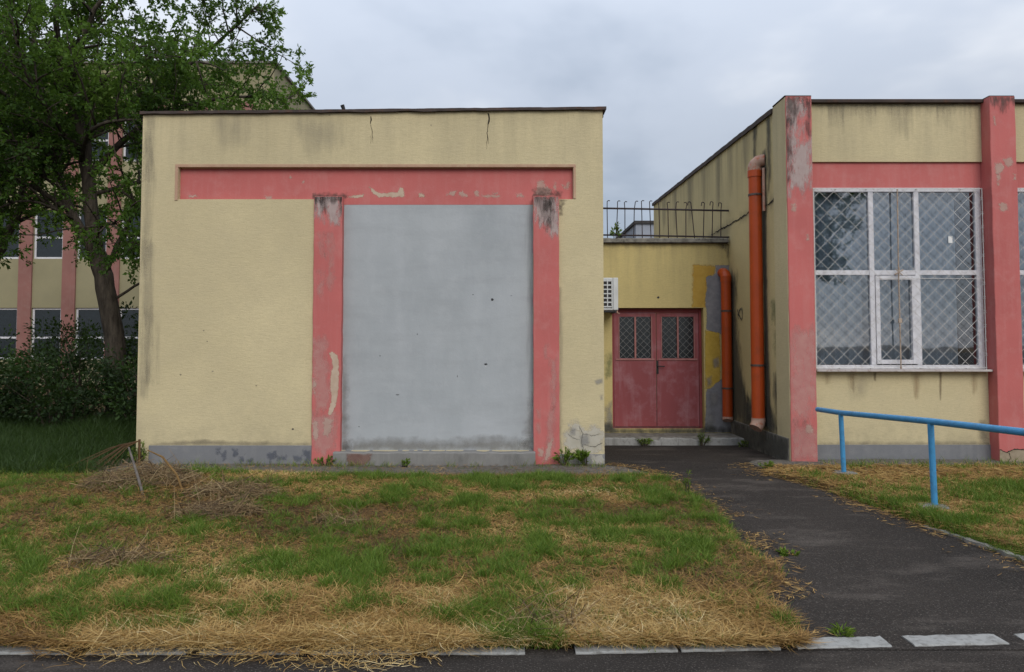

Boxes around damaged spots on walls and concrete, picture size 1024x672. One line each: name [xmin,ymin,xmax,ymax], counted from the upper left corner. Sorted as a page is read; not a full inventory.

peeling [348,188,404,198]
peeling [312,352,339,439]